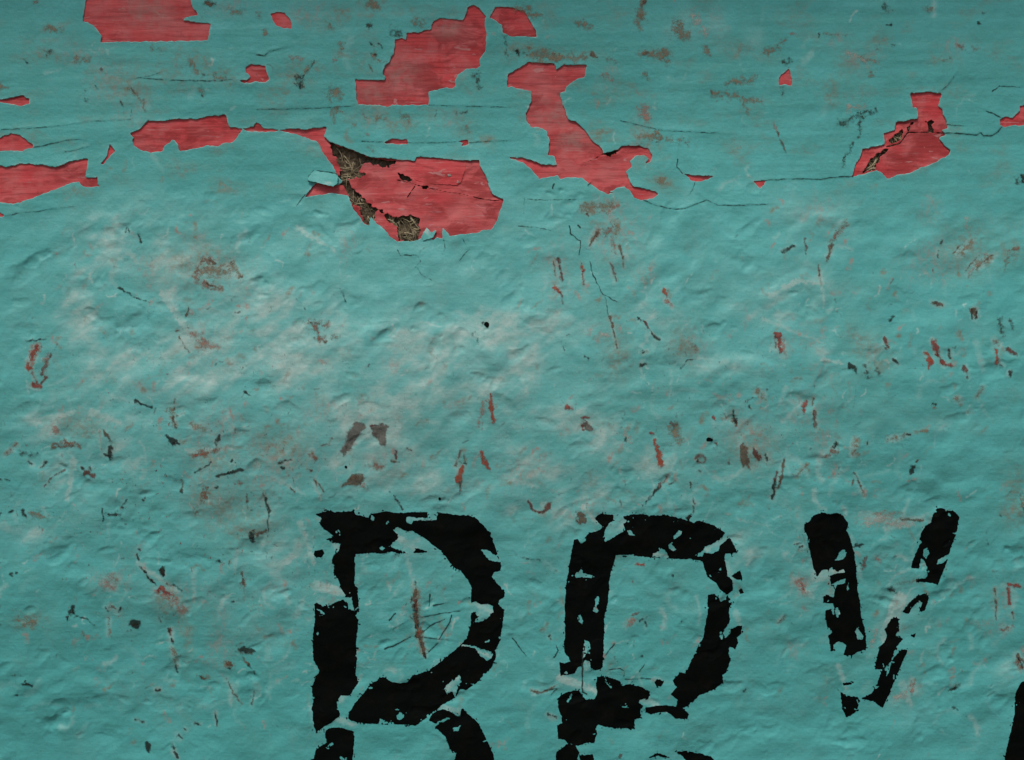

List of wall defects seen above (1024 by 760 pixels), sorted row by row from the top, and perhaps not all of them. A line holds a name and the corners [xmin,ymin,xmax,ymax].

peeling [83,0,211,43]
peeling [355,5,537,107]
peeling [0,159,99,217]
peeling [131,115,503,242]
peeling [507,62,658,200]
peeling [852,92,950,179]
crack [941,86,1013,136]